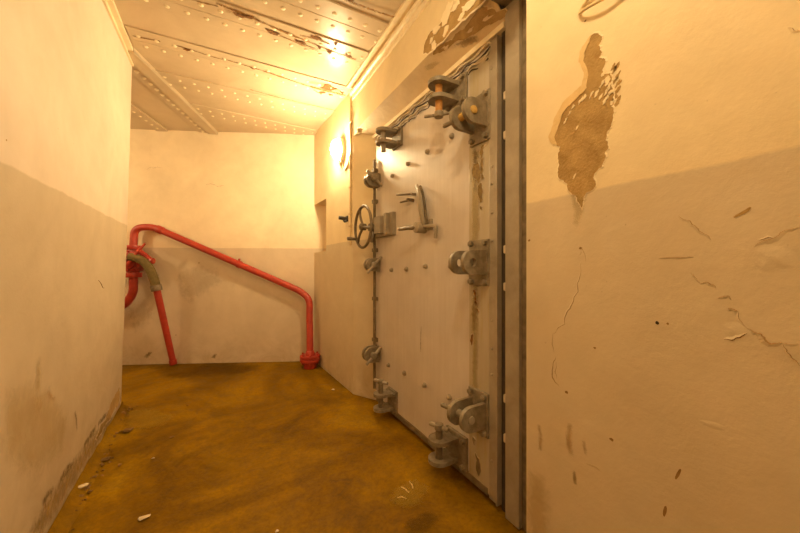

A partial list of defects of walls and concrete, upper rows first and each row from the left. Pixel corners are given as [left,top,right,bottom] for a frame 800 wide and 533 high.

peeling [423,0,508,55]
peeling [548,31,622,210]
crack [754,227,800,247]
crack [659,257,800,366]